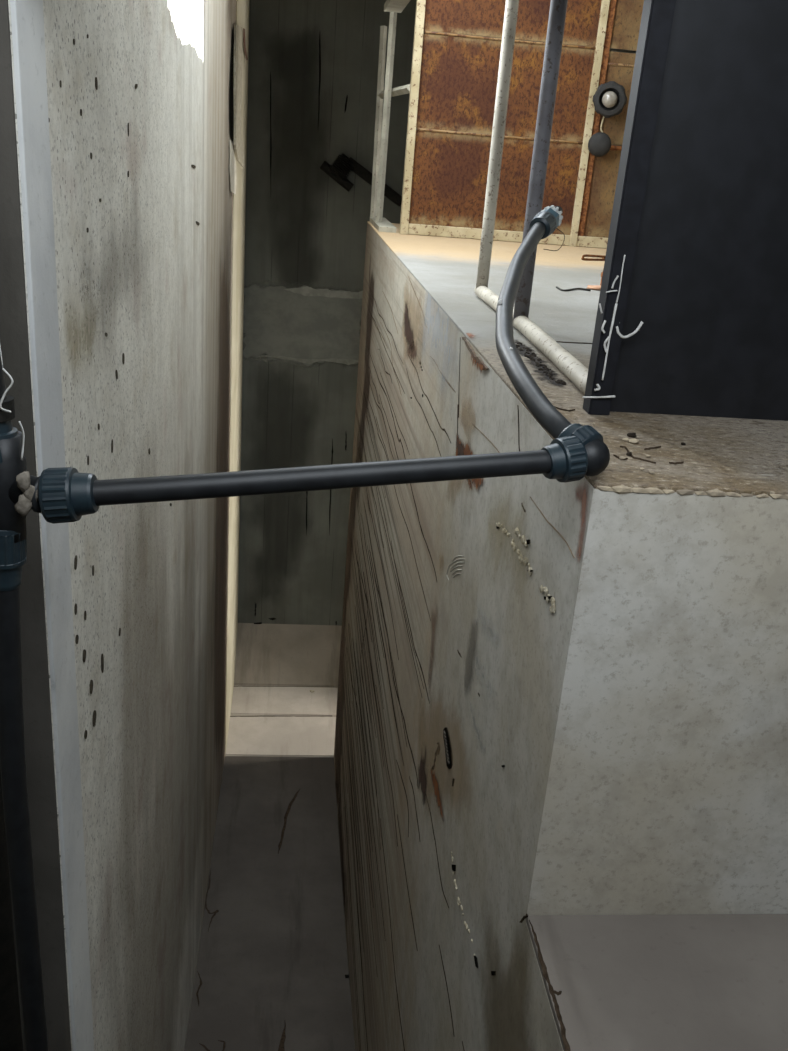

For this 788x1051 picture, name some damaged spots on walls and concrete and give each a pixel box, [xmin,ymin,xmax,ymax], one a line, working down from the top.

rust [456,436,473,456]
crack [278,1023,286,1051]